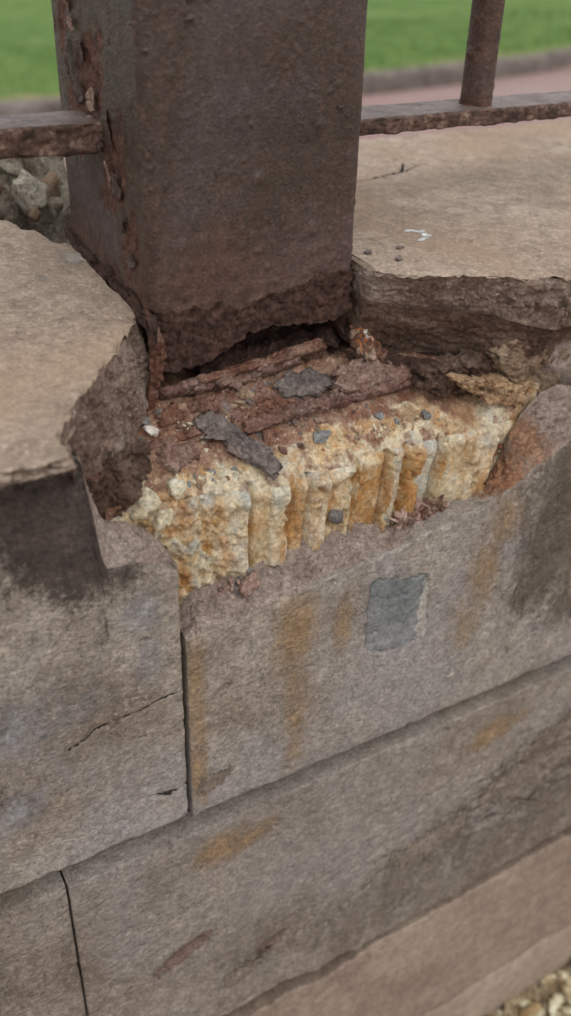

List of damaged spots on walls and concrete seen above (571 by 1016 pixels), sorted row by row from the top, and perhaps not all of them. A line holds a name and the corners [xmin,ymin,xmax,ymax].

spalling [57,317,178,571]
corrosion [155,441,201,476]
peeling [177,407,216,452]
peeling [203,377,284,442]
corrosion [151,262,435,436]
spalling [349,260,571,475]
spalling [179,494,450,639]